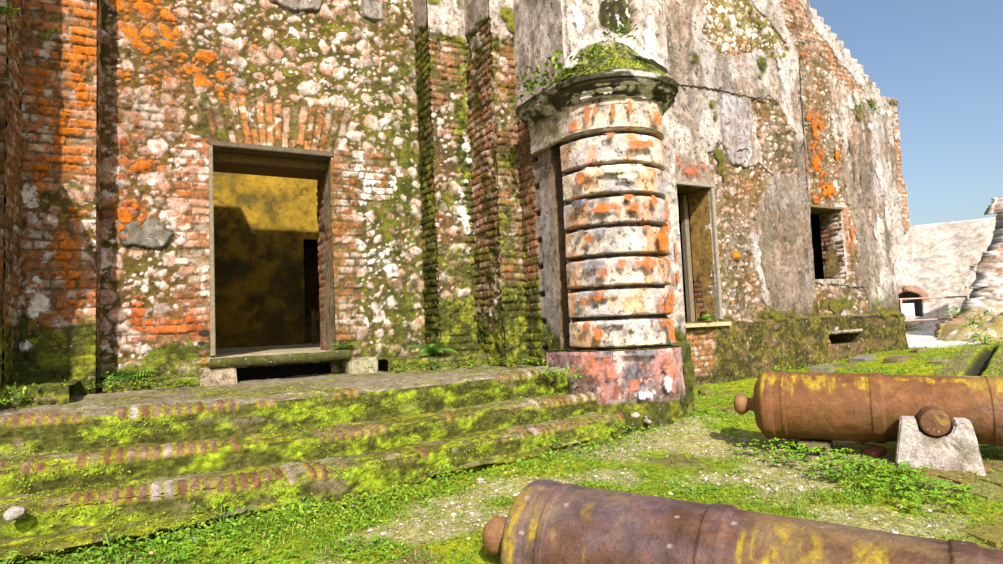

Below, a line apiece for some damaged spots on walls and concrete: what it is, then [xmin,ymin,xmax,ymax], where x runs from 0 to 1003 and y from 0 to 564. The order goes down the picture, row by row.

peeling [271,0,322,15]
peeling [360,0,384,23]
leakage [21,158,48,208]
spalling [702,0,871,322]
spalling [892,113,910,228]
leakage [53,206,93,314]
peeling [108,216,174,250]
leakage [18,276,51,352]